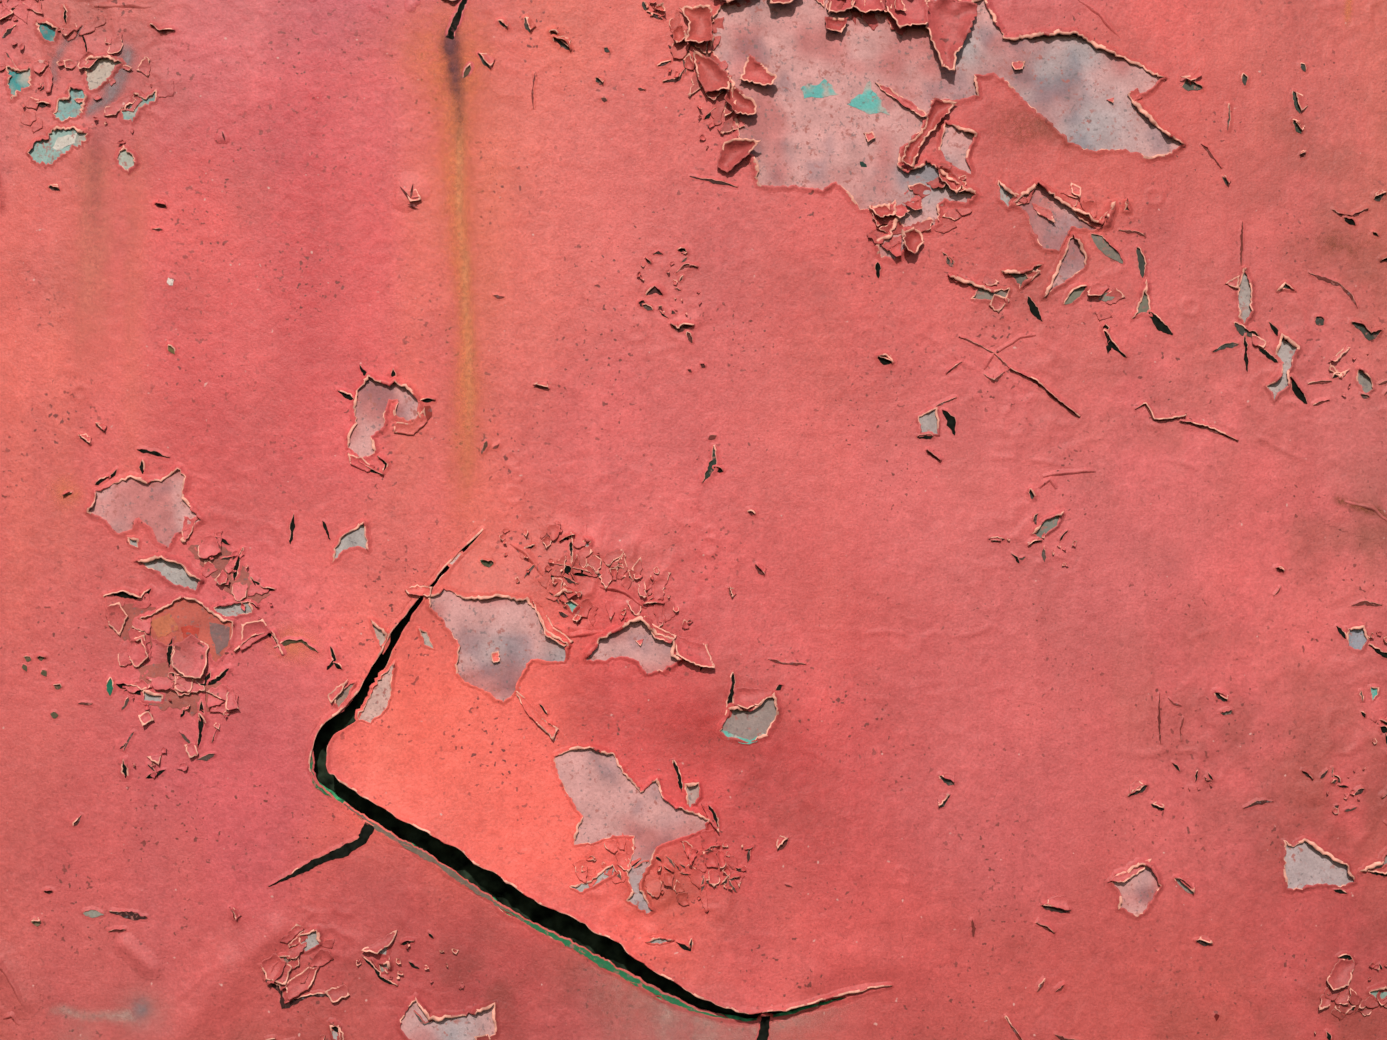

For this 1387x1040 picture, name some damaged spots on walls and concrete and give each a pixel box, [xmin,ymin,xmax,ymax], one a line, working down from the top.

peeling [0,0,178,193]
rust [437,35,474,426]
crack [442,0,471,40]
peeling [635,0,1231,345]
peeling [1210,220,1387,408]
peeling [60,446,289,782]
crack [285,510,299,547]
peeling [327,615,398,725]
crack [263,525,894,1040]
peeling [405,520,785,917]
peeling [1277,835,1387,896]
peeling [356,930,501,1040]